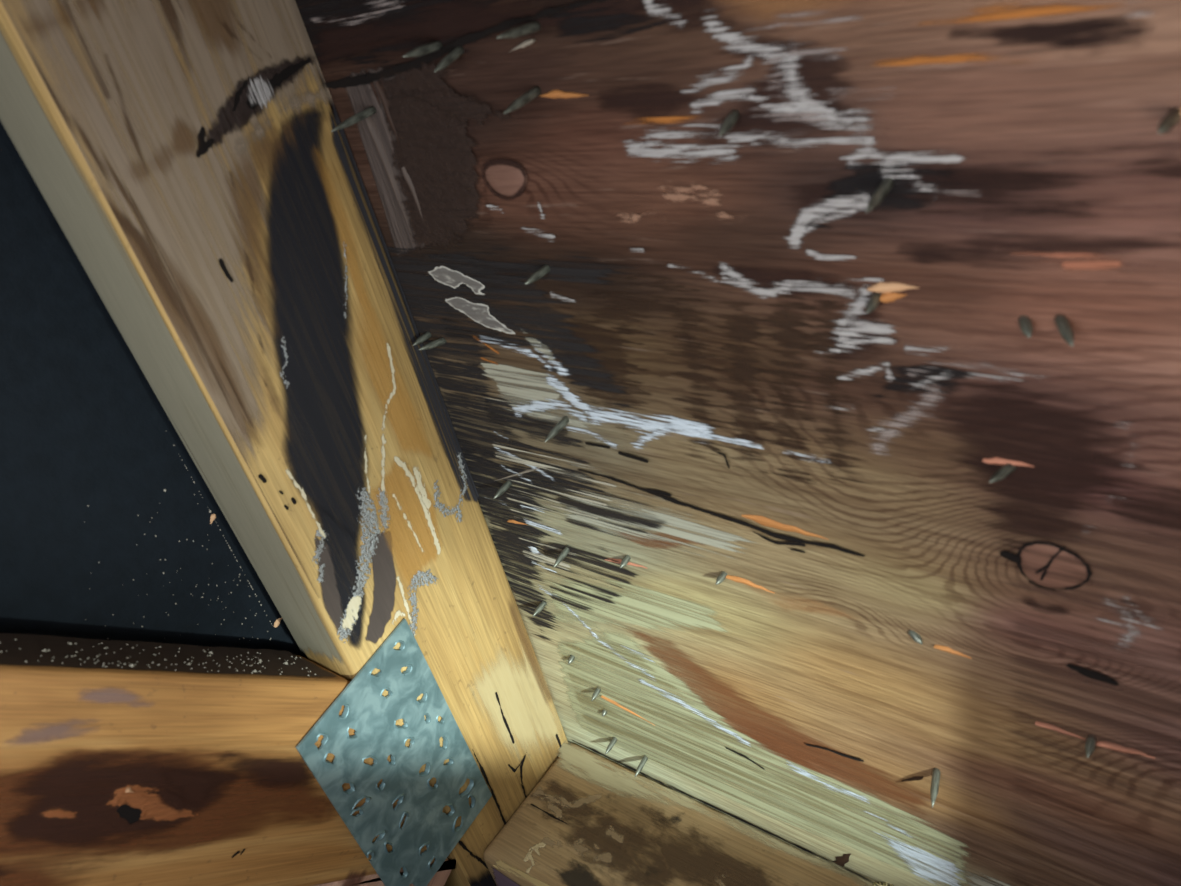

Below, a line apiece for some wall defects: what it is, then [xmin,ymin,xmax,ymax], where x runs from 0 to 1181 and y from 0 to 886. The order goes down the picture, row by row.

damp [159,0,182,47]
crack [196,0,607,158]
damp [295,0,1067,260]
damp [952,12,1152,46]
damp [33,61,253,427]
damp [230,76,1181,886]
crack [577,442,865,557]
damp [0,751,332,886]